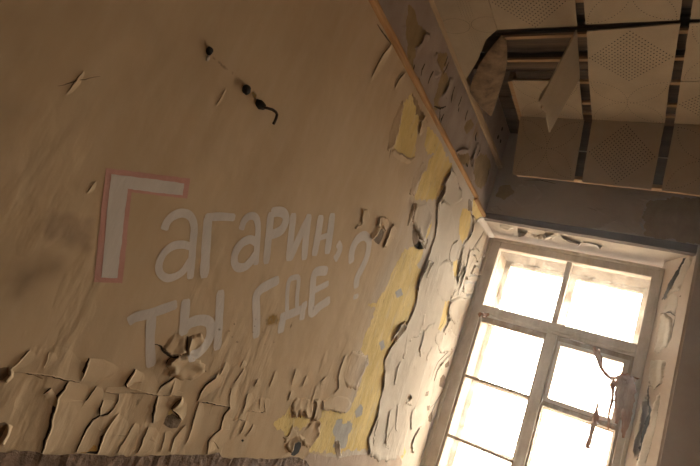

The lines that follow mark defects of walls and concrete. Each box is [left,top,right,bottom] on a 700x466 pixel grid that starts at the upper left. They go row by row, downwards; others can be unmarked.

peeling [0,93,493,466]
peeling [500,224,602,249]
peeling [633,293,681,466]